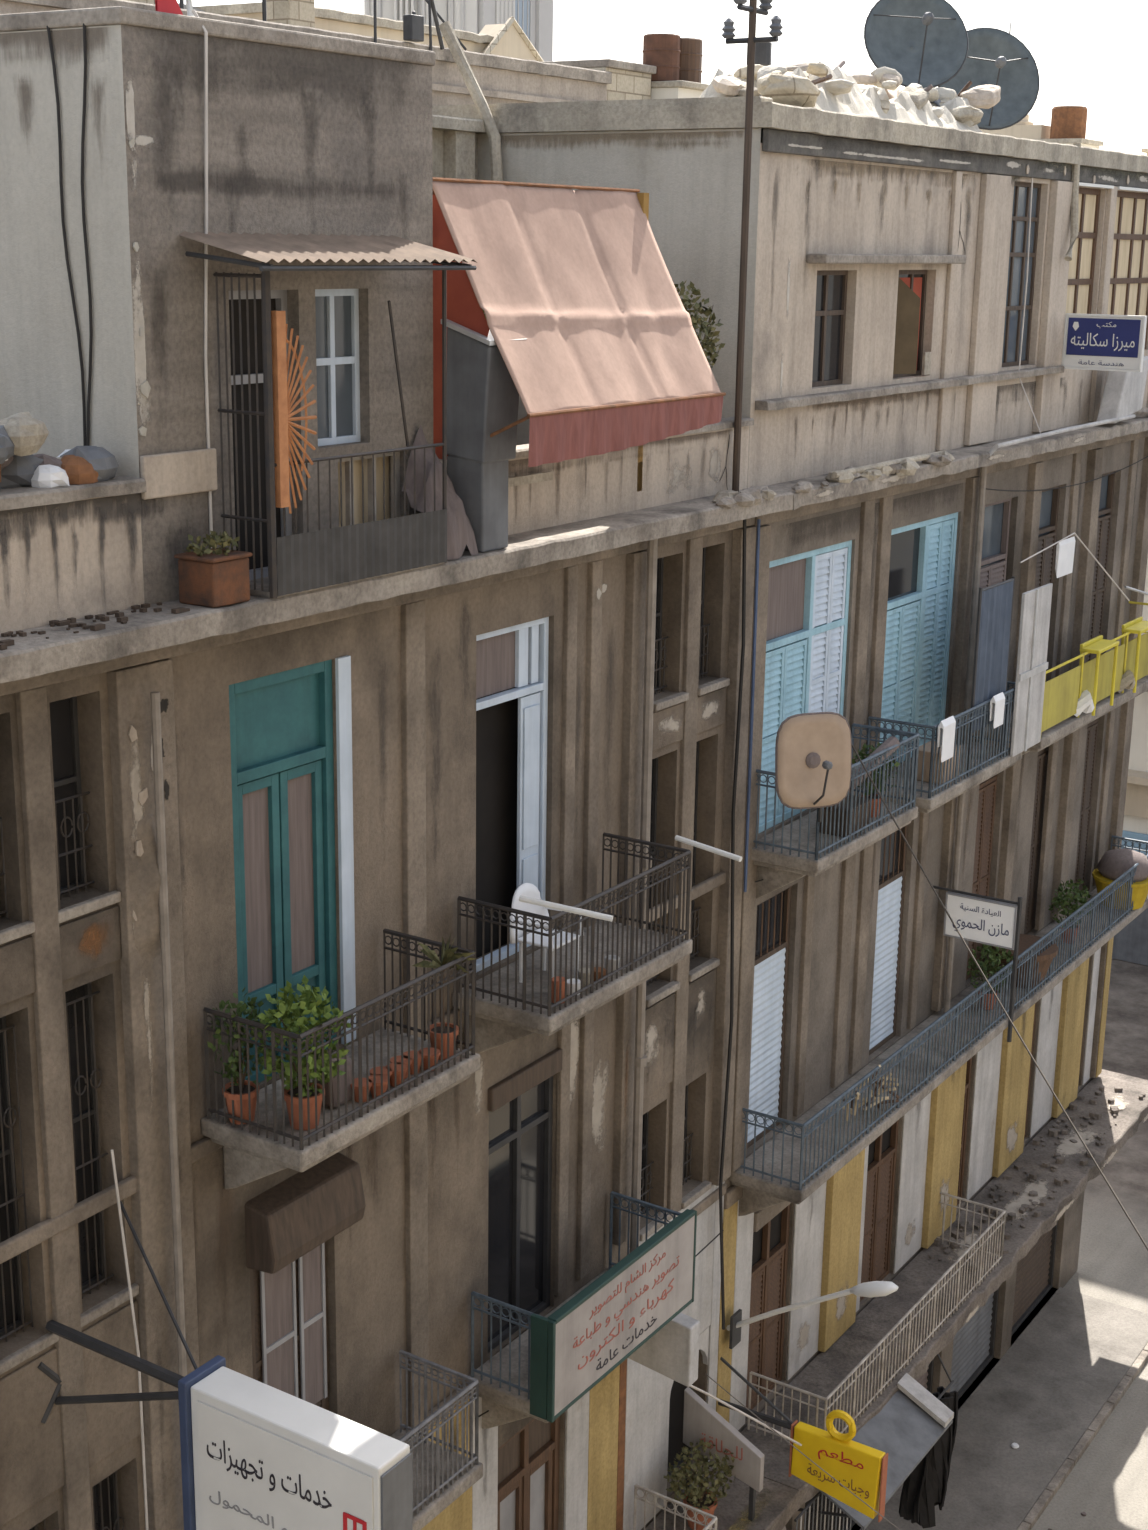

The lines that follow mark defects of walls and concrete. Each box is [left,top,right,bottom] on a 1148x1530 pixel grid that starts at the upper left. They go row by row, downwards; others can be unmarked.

leakage [0,493,156,584]
flaking render [128,725,170,857]
flaking render [144,982,152,1069]
flaking render [475,1061,483,1112]
flaking render [570,1021,580,1101]
flaking render [592,1061,607,1149]